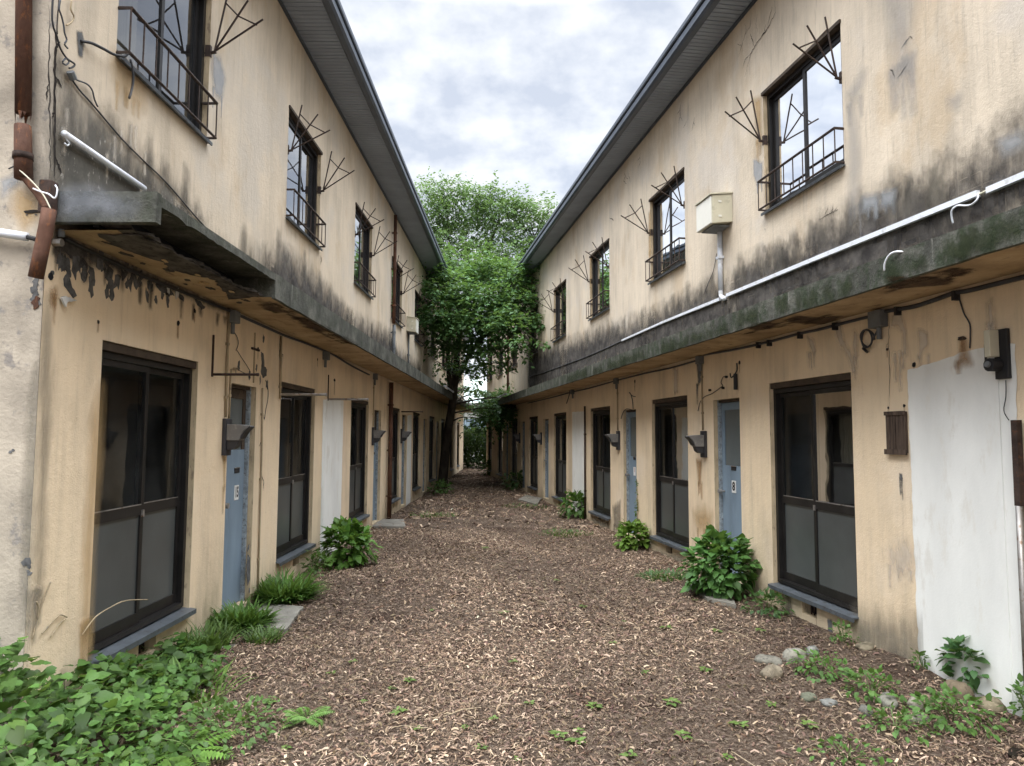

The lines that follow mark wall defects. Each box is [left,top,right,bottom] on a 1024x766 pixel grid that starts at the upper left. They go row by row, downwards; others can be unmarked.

damp [53,231,230,323]
spalling [30,234,257,313]
damp [260,249,420,371]
damp [528,137,1024,387]